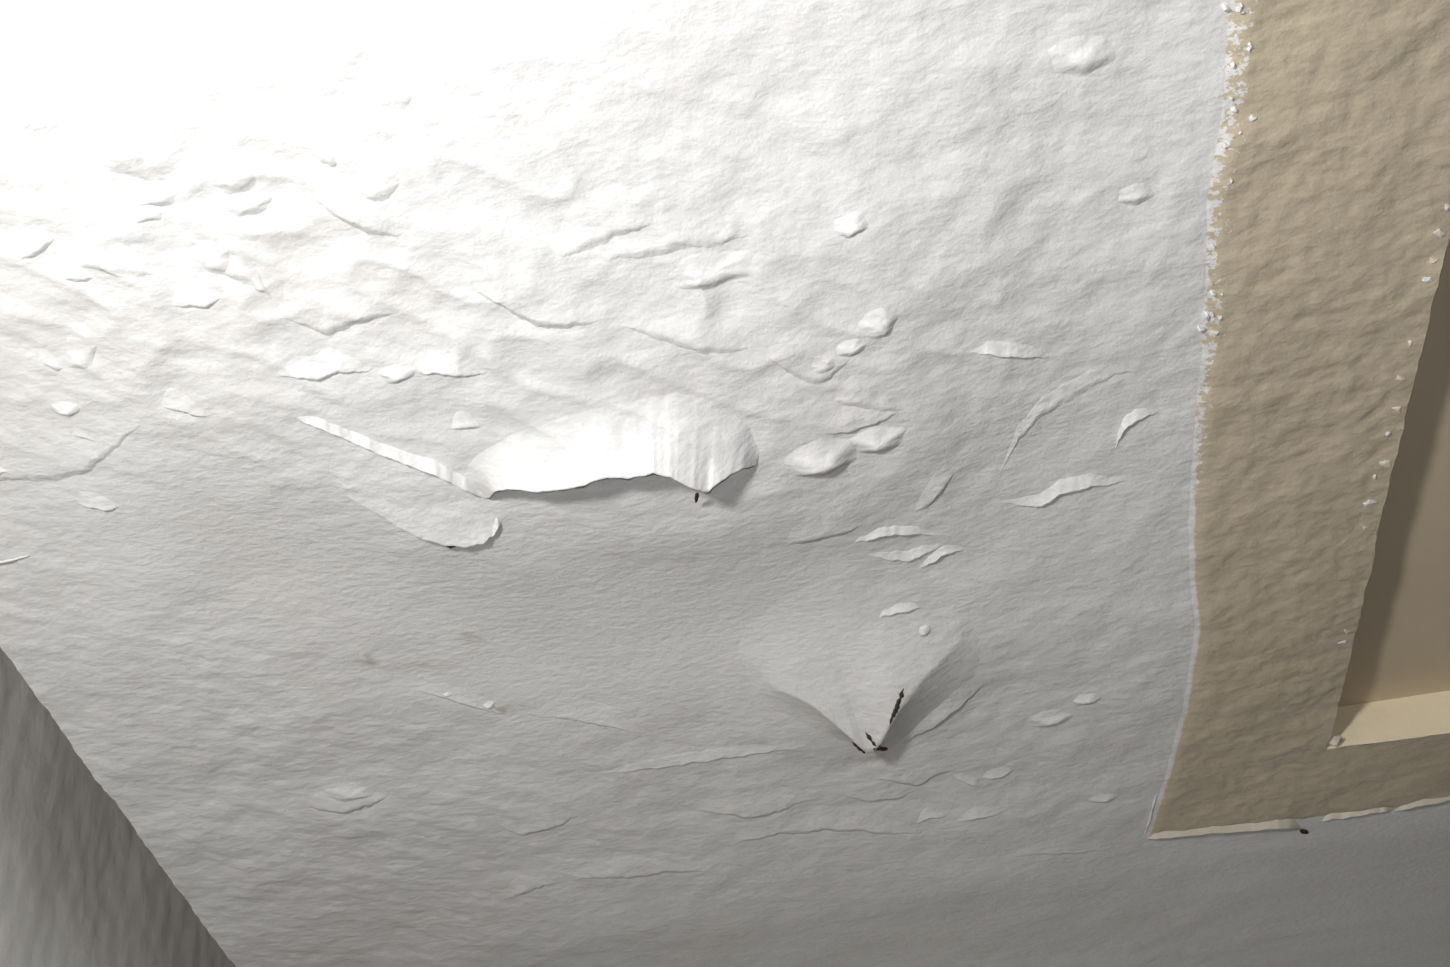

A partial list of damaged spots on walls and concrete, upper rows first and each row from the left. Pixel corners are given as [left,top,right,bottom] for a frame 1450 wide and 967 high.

peeling [1115,408,1159,449]
peeling [296,392,760,548]
peeling [1321,796,1450,821]
peeling [1146,819,1302,840]